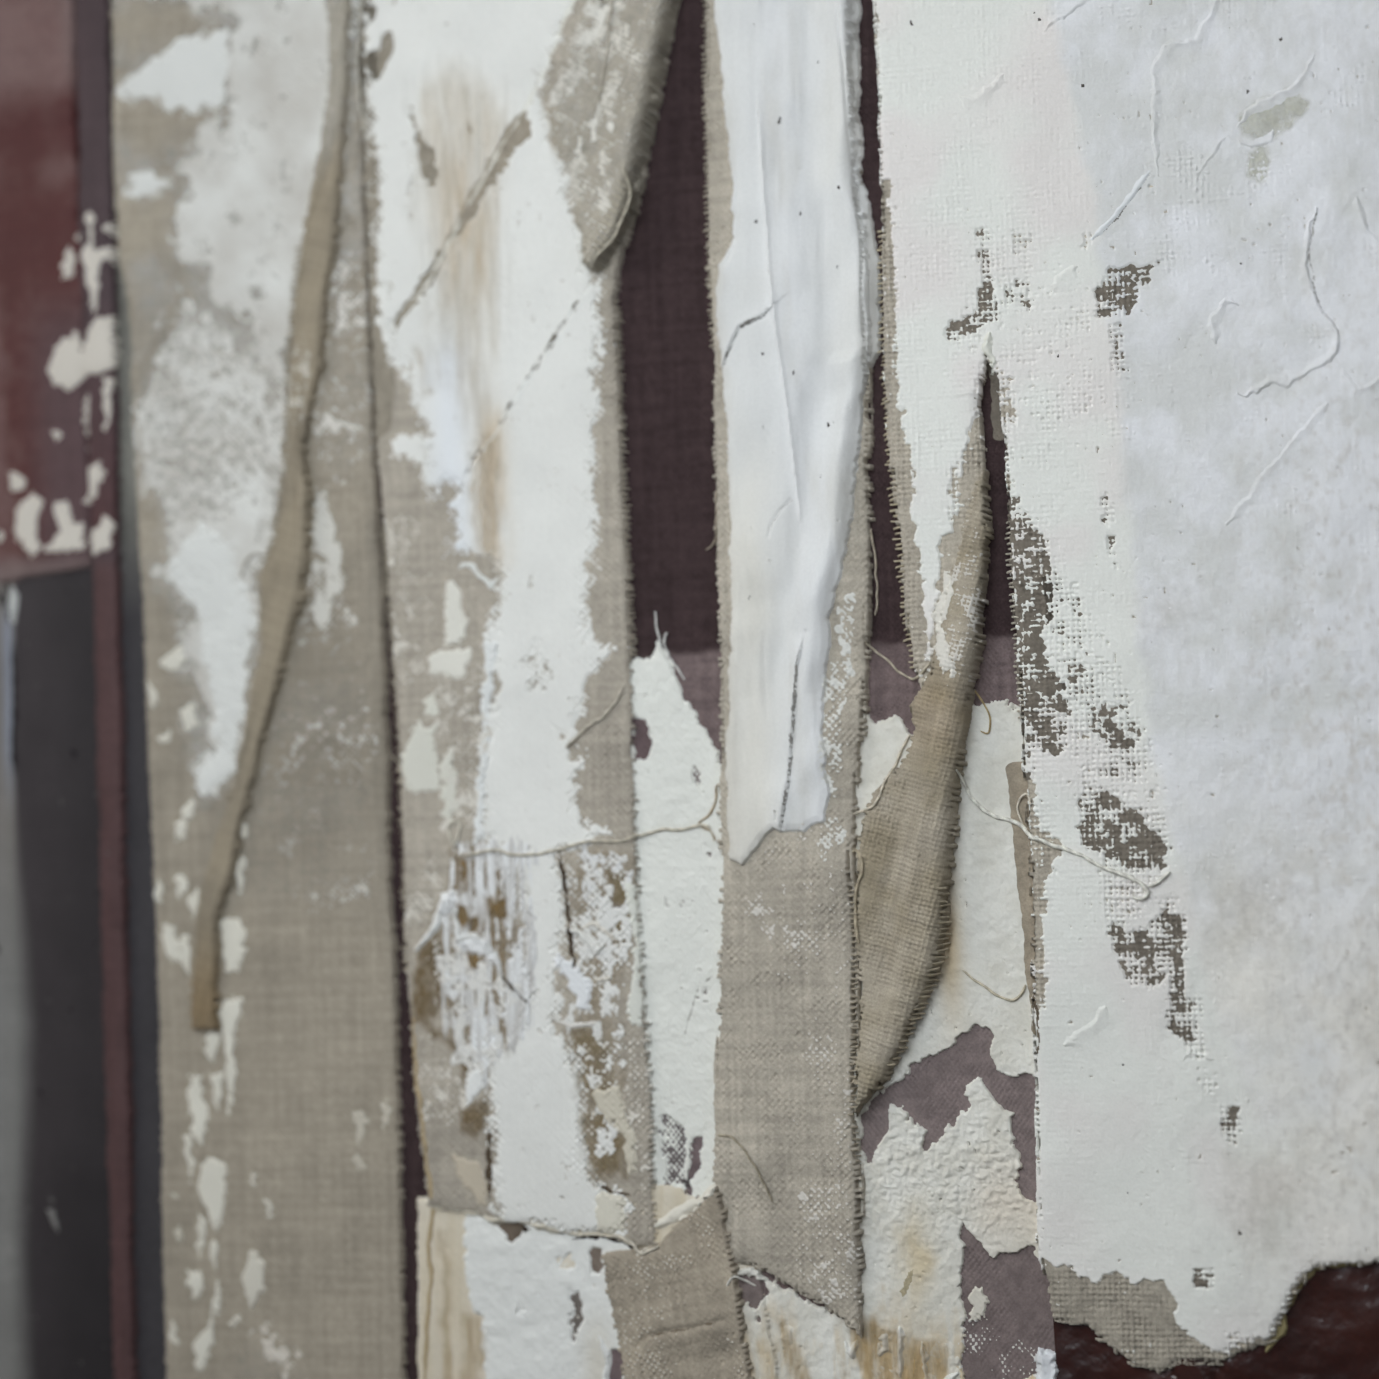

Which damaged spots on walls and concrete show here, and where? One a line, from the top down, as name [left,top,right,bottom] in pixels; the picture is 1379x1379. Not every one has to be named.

peeling [0,212,121,559]
peeling [931,527,989,686]
peeling [630,718,652,760]
peeling [161,924,191,974]
peeling [219,915,247,973]
peeling [417,935,522,1127]
peeling [168,995,303,1379]
peeling [498,1222,524,1242]
peeling [553,845,728,1379]
spalling [739,1274,766,1322]
spalling [795,1018,1039,1306]
spalling [923,1223,1241,1379]